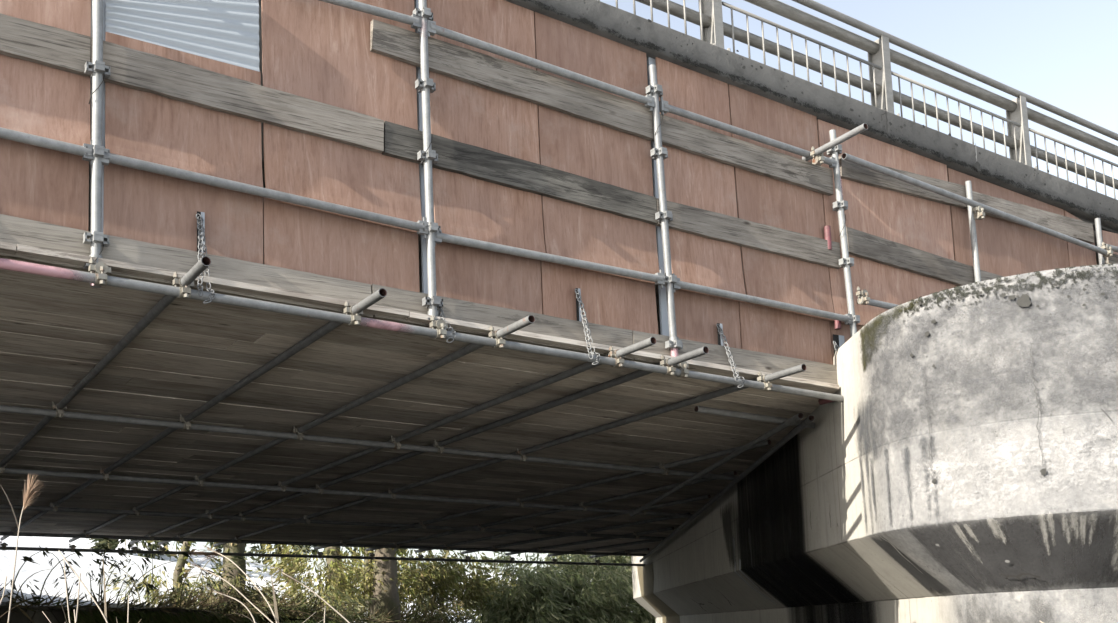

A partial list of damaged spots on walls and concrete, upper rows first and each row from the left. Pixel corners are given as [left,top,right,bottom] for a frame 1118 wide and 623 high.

water stain [720,428,875,623]
water stain [857,276,1118,623]
crack [1030,343,1044,464]